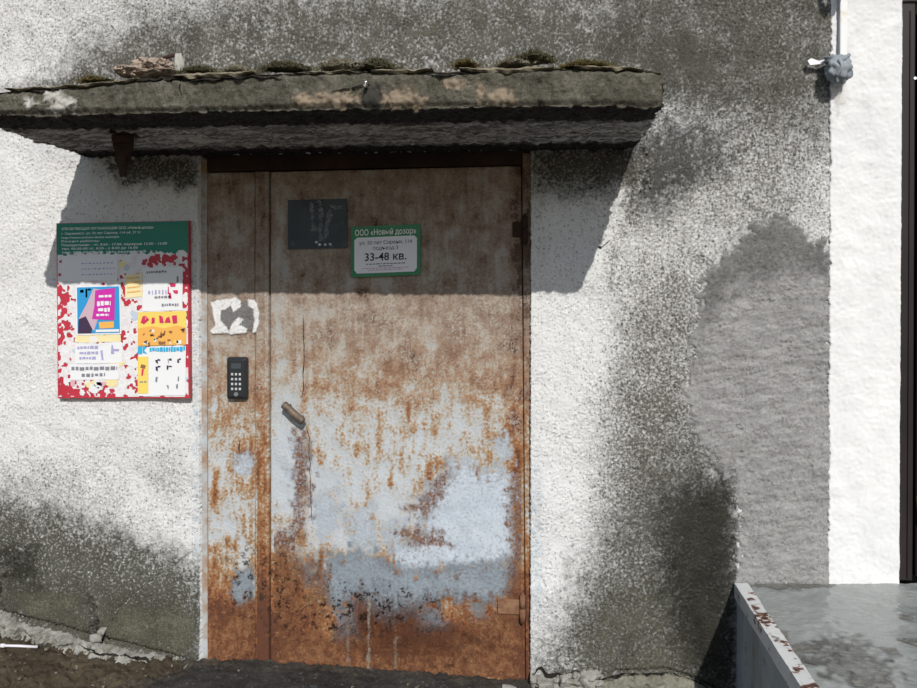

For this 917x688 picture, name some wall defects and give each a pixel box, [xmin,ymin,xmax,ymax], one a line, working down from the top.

spalling [0,609,188,668]
leakage [0,492,200,661]
rust [210,556,255,659]
rust [274,427,521,679]
spalling [530,669,606,688]
leakage [534,441,737,688]